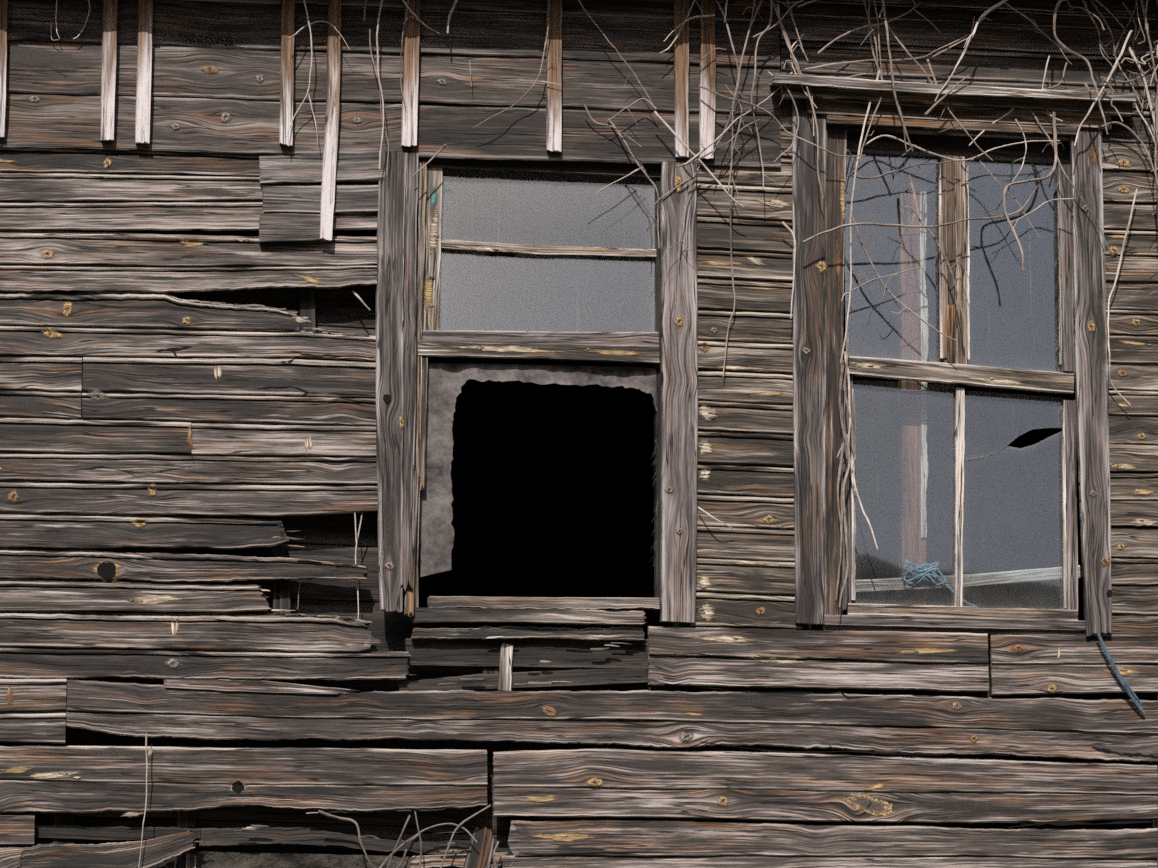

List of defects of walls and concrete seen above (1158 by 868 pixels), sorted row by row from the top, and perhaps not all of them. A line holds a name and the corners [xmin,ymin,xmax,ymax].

spalling [294,274,326,285]